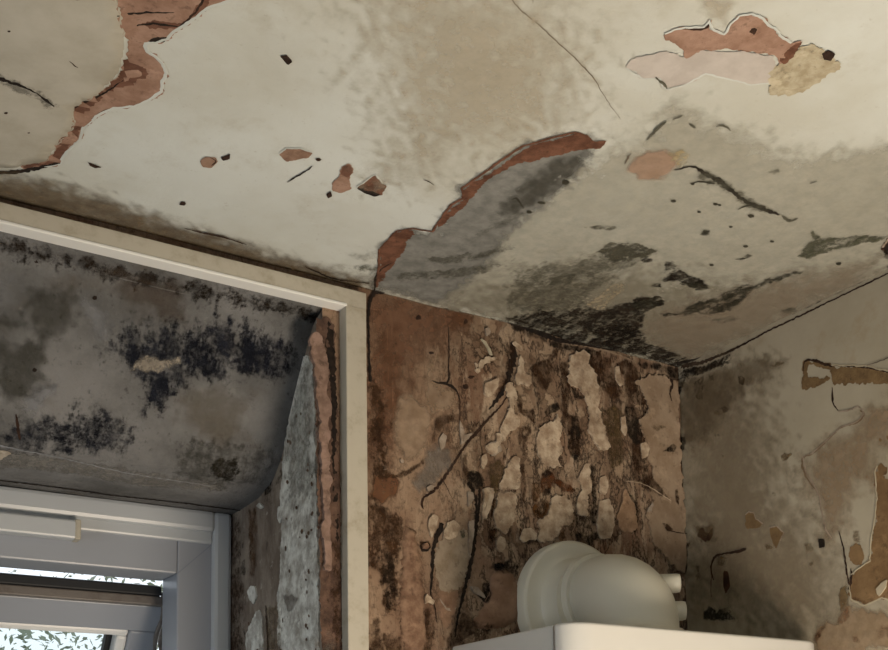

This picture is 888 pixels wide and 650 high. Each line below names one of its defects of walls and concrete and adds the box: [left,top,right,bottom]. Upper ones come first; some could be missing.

crack [0,77,54,107]
flaking render [21,0,234,169]
peeling [626,13,841,96]
water stain [0,179,372,288]
flaking render [372,132,606,303]
water stain [5,402,135,455]
water stain [0,237,321,416]
water stain [231,509,256,650]
peeling [245,317,342,650]
peeling [427,456,521,628]
peeling [519,366,687,573]
water stain [425,110,888,627]